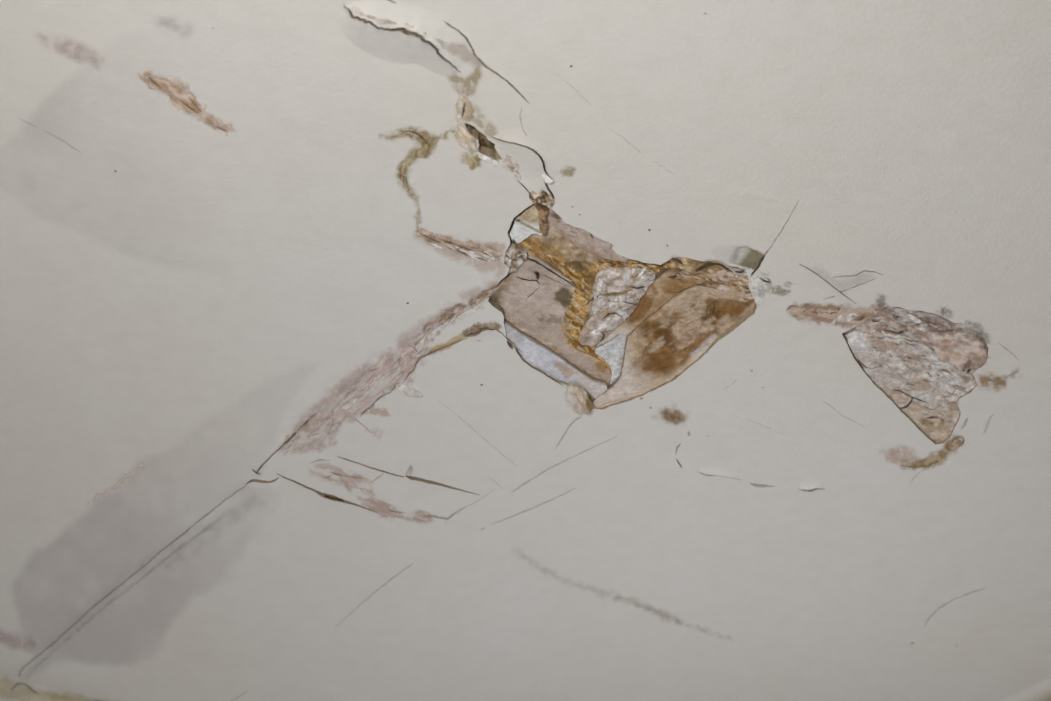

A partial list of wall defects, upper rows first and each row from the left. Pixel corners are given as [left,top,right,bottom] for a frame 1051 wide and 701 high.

peeling [140,73,232,131]
crack [338,0,532,102]
damp [388,128,454,198]
flaking render [257,203,772,472]
flaking render [788,296,988,442]
crack [405,466,479,504]
crack [19,470,388,675]